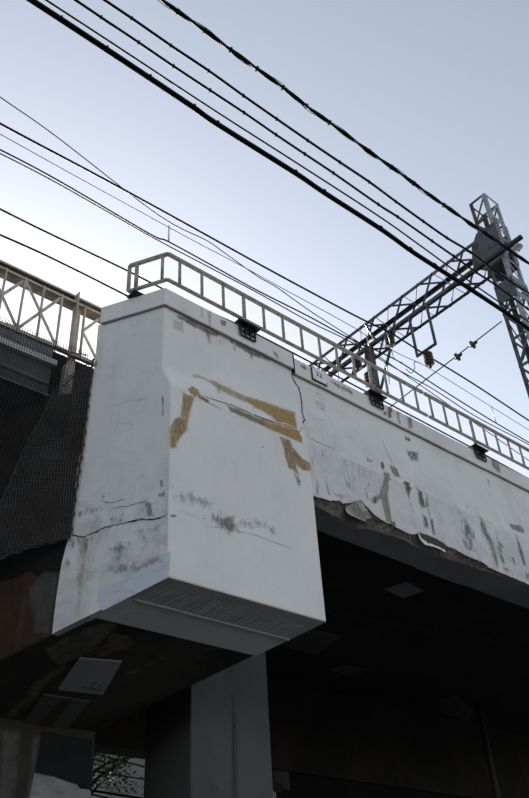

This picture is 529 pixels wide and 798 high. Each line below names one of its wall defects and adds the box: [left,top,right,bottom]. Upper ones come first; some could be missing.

crack [200,377,334,449]
crack [71,499,166,538]
water stain [204,515,241,534]
water stain [373,466,435,534]
spalling [313,496,529,586]
water stain [479,516,528,578]